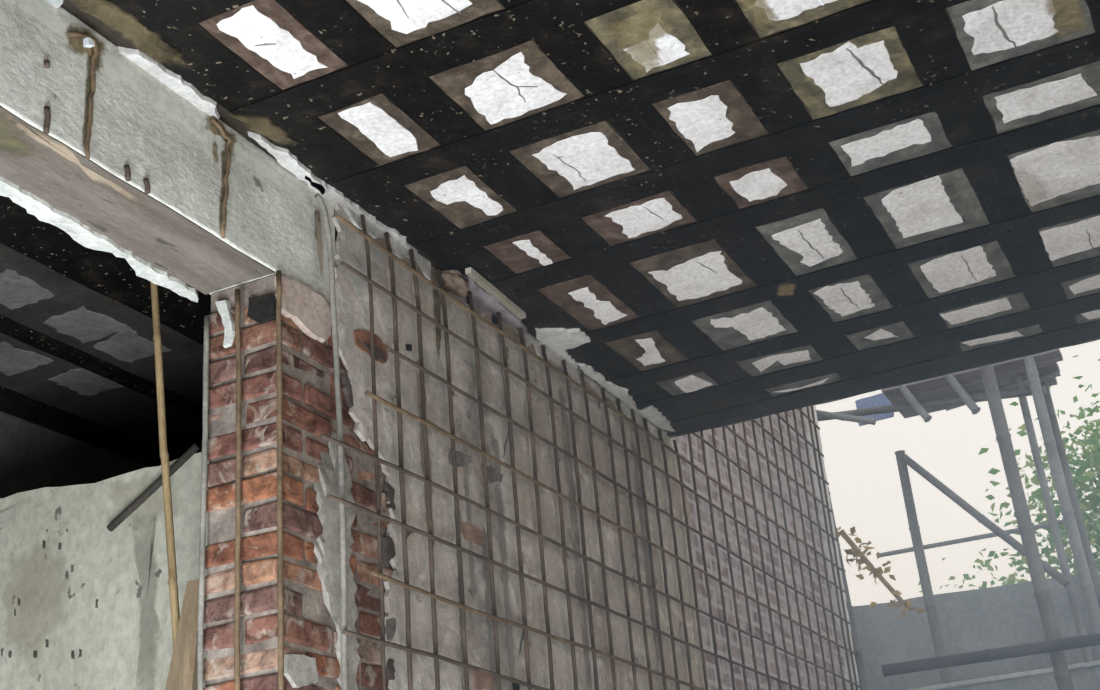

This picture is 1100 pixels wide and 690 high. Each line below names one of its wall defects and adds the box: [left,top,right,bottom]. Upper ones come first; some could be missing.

rust [67,27,104,159]
crack [493,70,538,102]
crack [846,48,886,86]
crack [992,7,1016,47]
rust [206,116,236,238]
crack [797,230,824,259]
peeling [808,274,893,322]
spalling [247,121,862,690]
spalling [197,316,210,690]
spalling [234,270,284,690]